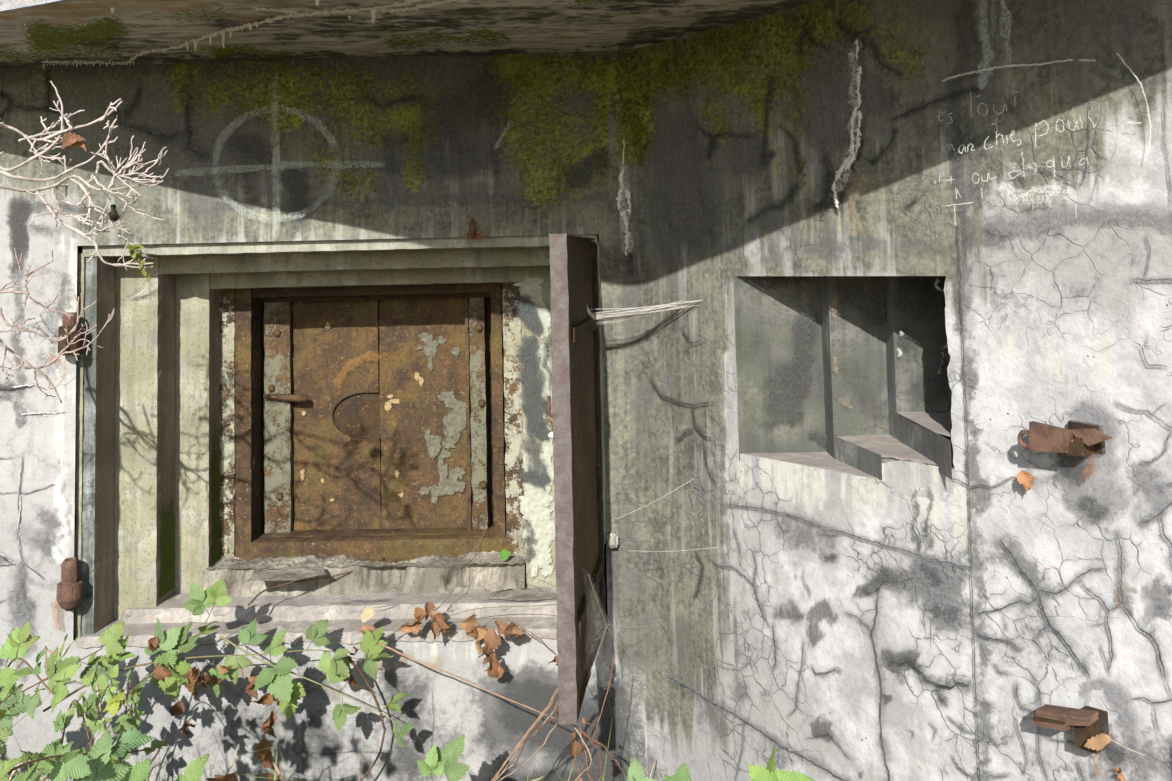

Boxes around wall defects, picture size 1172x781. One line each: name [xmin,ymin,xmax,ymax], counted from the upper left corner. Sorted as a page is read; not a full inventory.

damp [799,38,889,209]
damp [7,199,44,268]
damp [281,168,309,216]
damp [568,140,633,276]
damp [986,186,1172,235]
crack [0,384,63,416]
spalling [203,276,557,601]
crack [0,458,60,579]
crack [651,221,1172,781]
damp [501,664,646,781]